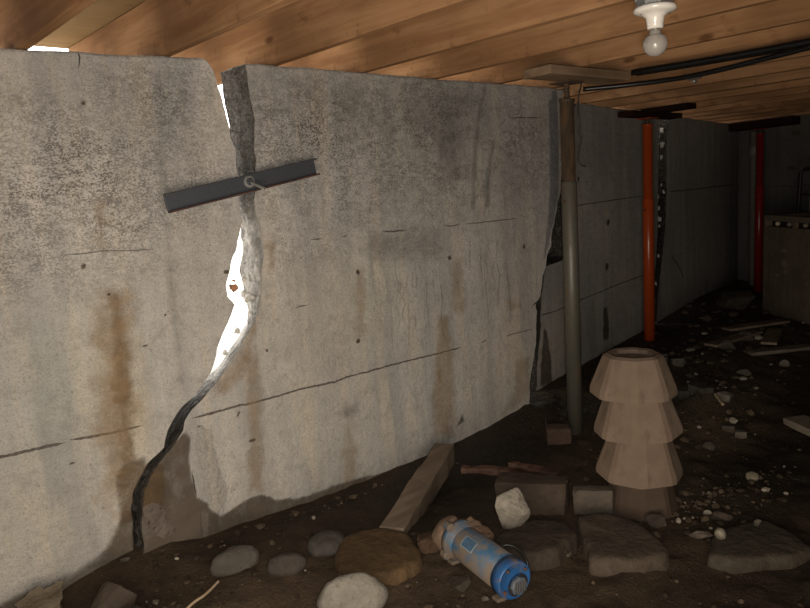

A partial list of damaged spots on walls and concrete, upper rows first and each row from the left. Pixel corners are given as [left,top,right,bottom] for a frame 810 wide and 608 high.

crack [446,218,517,227]
crack [69,248,151,256]
crack [507,119,739,391]
crack [131,64,461,551]
crack [0,425,142,459]